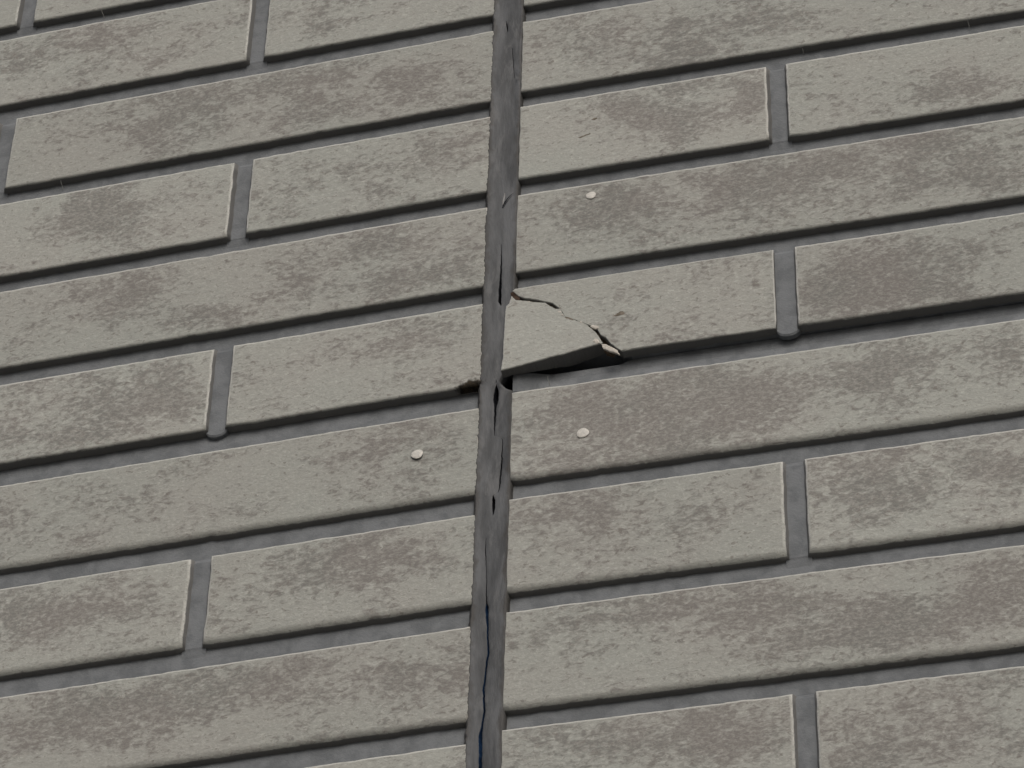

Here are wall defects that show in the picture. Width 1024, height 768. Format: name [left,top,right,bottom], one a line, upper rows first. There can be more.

crack [498,247,611,347]
crack [492,384,503,514]
crack [478,542,490,768]